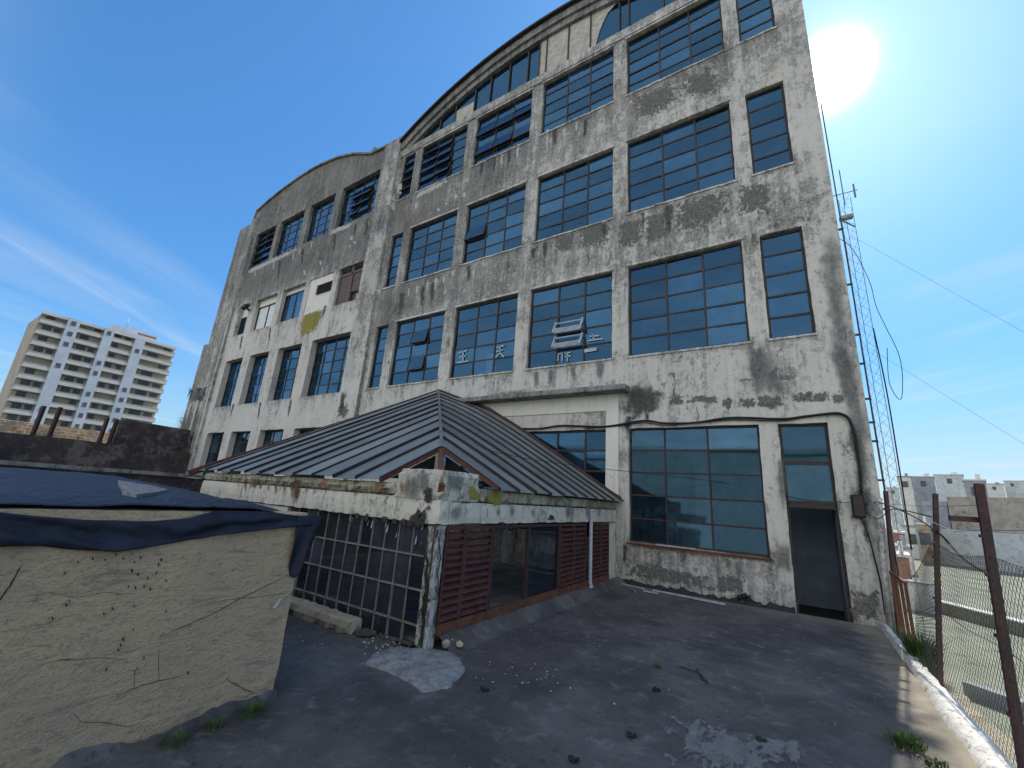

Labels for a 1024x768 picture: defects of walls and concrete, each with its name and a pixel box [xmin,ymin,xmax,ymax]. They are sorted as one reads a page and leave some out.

leakage [623,386,662,433]
spalling [669,391,844,409]
leakage [824,246,871,539]
crack [0,563,131,600]
peeling [621,562,746,593]
peeling [850,590,880,621]
crack [37,574,294,695]